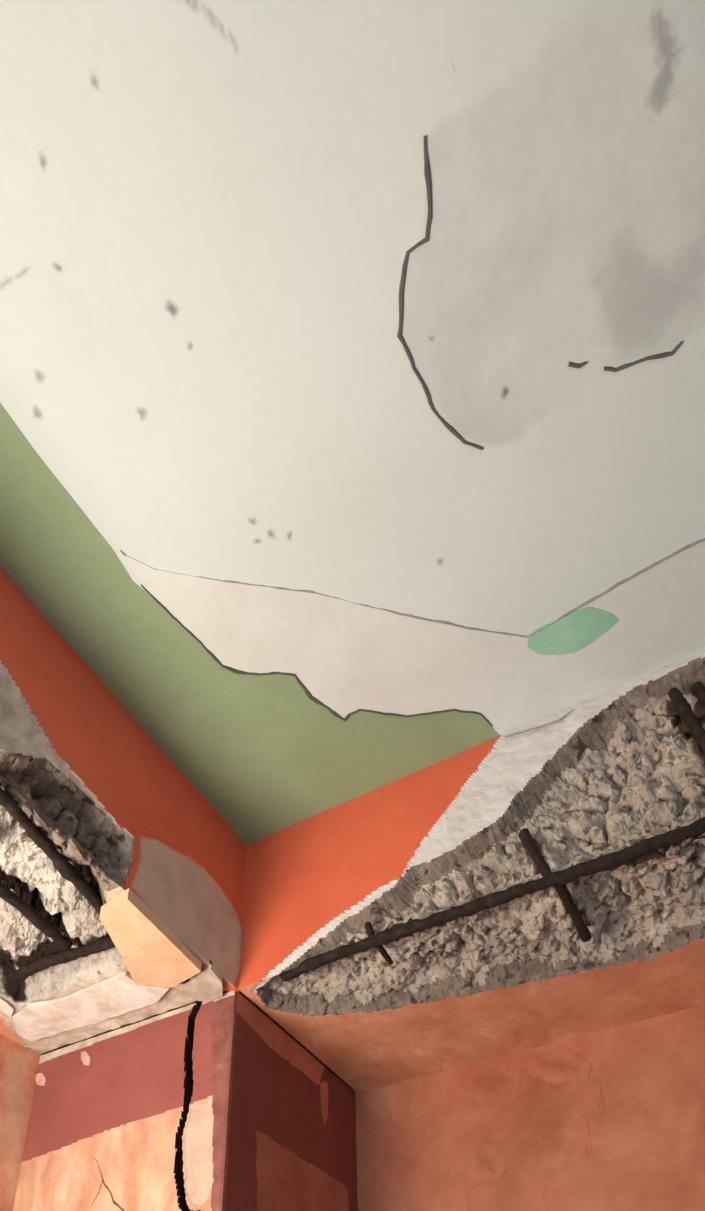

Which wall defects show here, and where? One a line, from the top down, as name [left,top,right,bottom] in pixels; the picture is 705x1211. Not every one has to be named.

spalling [0,538,705,1066]
crack [173,960,212,1211]